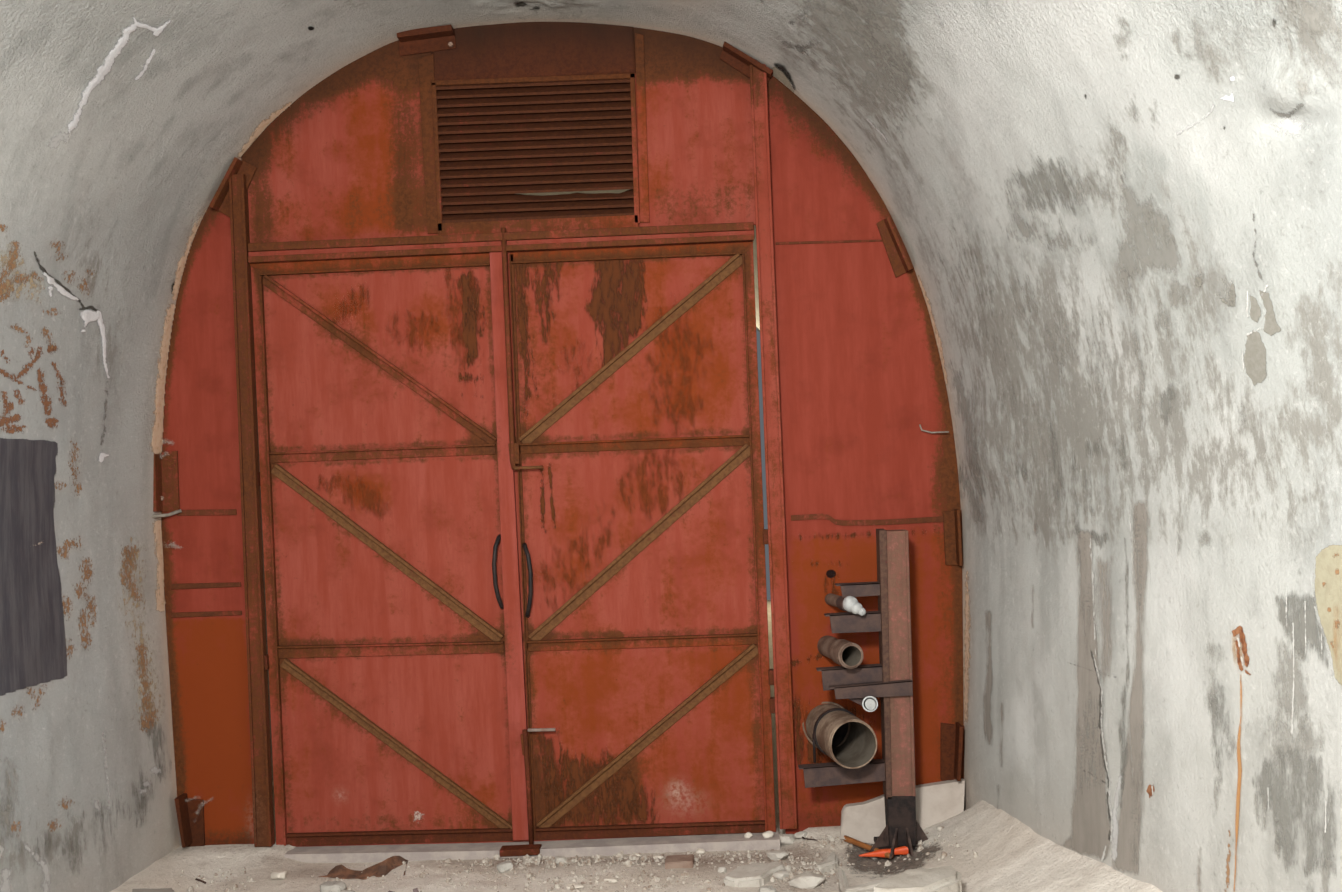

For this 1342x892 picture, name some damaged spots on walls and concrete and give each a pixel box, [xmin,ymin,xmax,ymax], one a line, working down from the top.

damp [1017,160,1108,237]
rust [0,224,67,434]
crack [34,251,110,445]
rust [445,268,485,382]
rust [586,259,647,367]
peeling [1221,214,1281,386]
rust [535,732,656,826]
damp [984,612,1003,744]
damp [1064,502,1147,873]
damp [1208,688,1234,765]
rust [1225,679,1242,892]
damp [1253,596,1335,892]